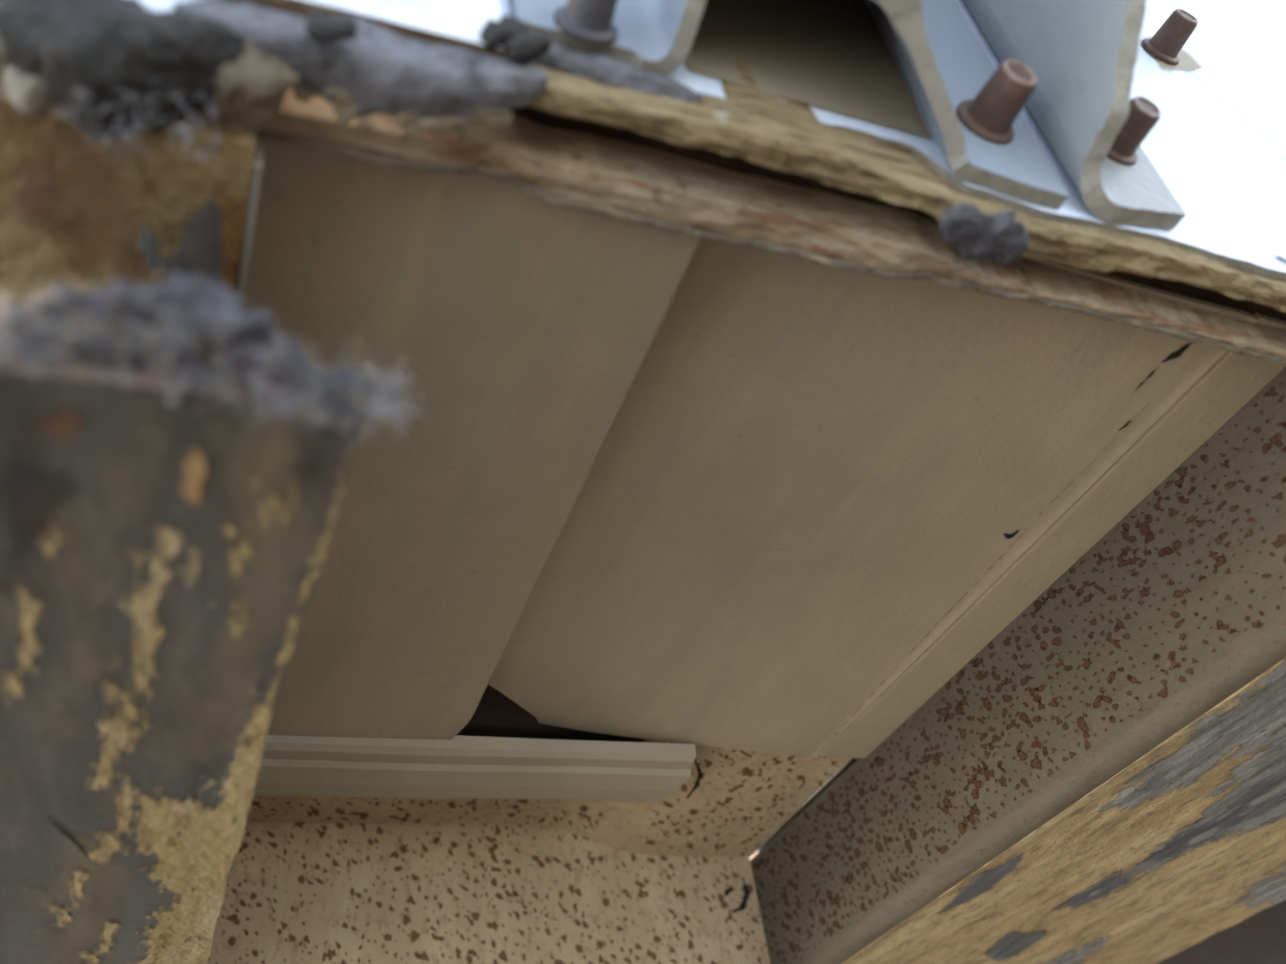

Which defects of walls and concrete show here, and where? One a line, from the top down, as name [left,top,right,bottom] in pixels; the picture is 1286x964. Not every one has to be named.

corrosion [182,447,207,505]
peeling [0,588,41,697]
corrosion [221,381,1286,964]
peeling [51,527,300,964]
peeling [1088,662,1286,897]
peeling [1227,862,1286,908]
spalling [984,930,1046,961]